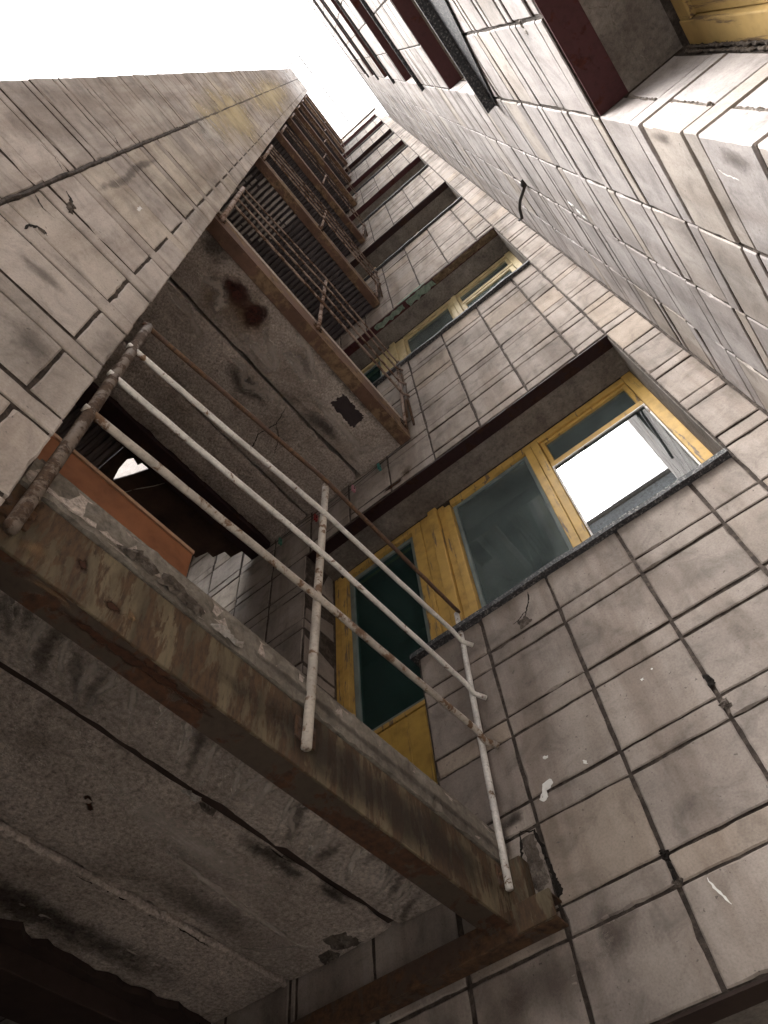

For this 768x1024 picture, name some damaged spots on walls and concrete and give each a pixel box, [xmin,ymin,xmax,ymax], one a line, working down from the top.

rust [34,581,212,717]
spalling [519,829,563,898]
spalling [318,932,364,965]